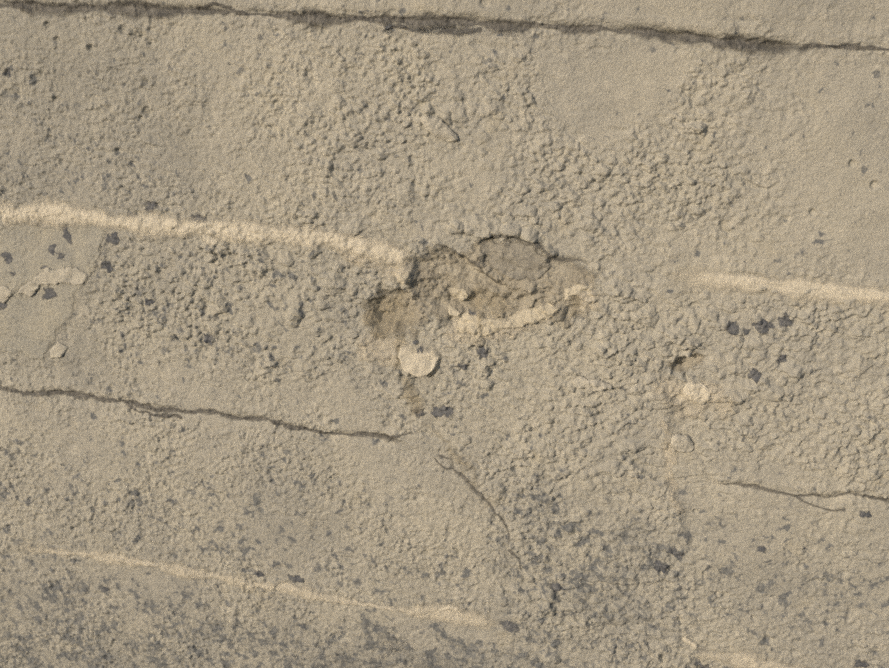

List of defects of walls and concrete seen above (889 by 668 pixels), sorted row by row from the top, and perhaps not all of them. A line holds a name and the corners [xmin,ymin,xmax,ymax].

crack [0,0,889,54]
peeling [0,223,106,361]
spalling [362,236,595,341]
crack [0,386,412,441]
crack [724,483,889,511]